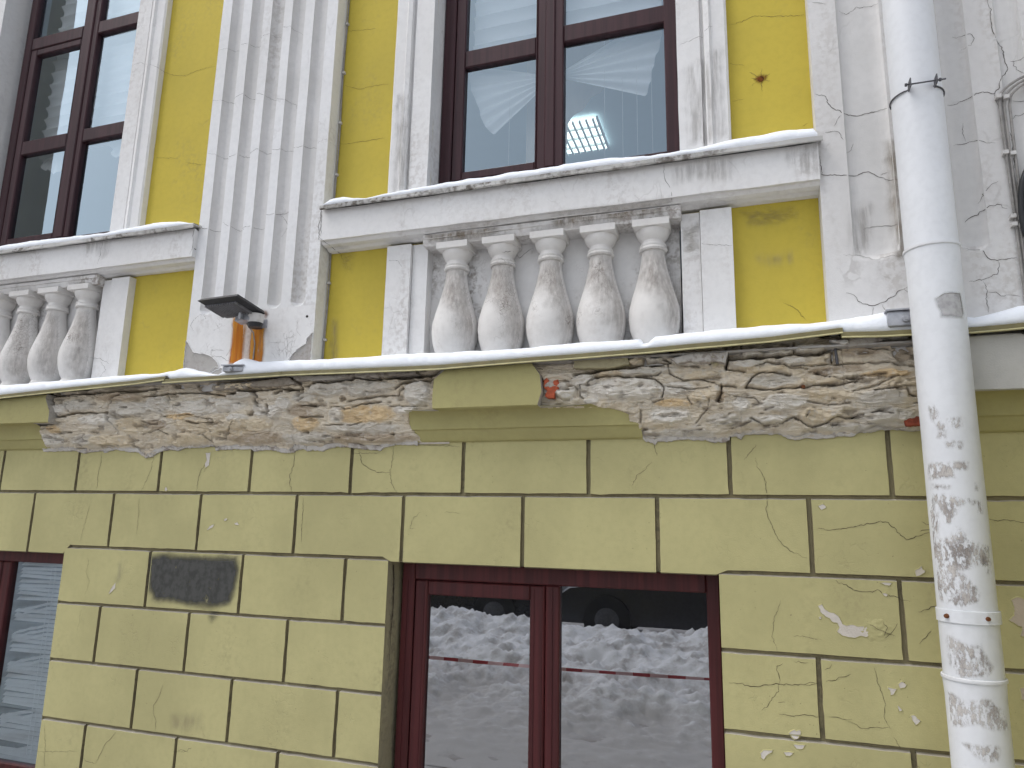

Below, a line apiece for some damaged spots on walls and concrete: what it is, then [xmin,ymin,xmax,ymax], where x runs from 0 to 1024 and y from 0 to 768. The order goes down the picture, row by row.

crack [949,0,1024,166]
crack [805,95,896,181]
crack [966,248,1017,312]
flaking render [183,341,223,375]
flaking render [289,332,314,361]
crack [819,521,930,540]
peeling [914,462,988,605]
peeling [817,603,870,639]
crack [842,583,936,644]
crack [736,601,919,767]
peeling [949,638,991,676]
peeling [949,694,1006,729]